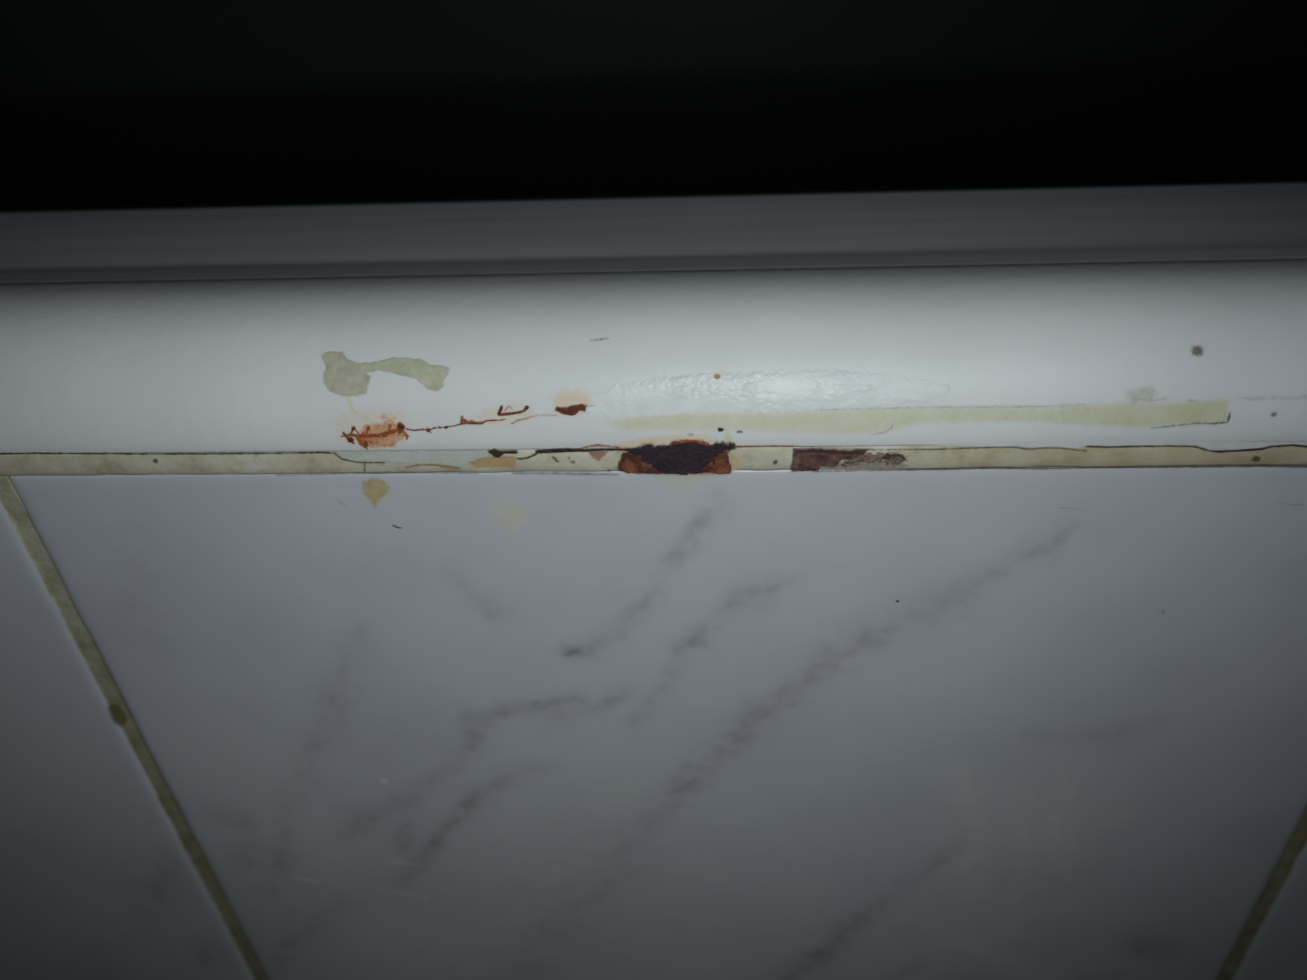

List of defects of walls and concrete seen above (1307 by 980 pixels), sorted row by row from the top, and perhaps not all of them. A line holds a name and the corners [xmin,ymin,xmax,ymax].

peeling [321,350,450,420]
corrosion [529,386,597,418]
damp [608,384,1307,436]
corrosion [589,427,908,499]
crack [795,444,1307,473]